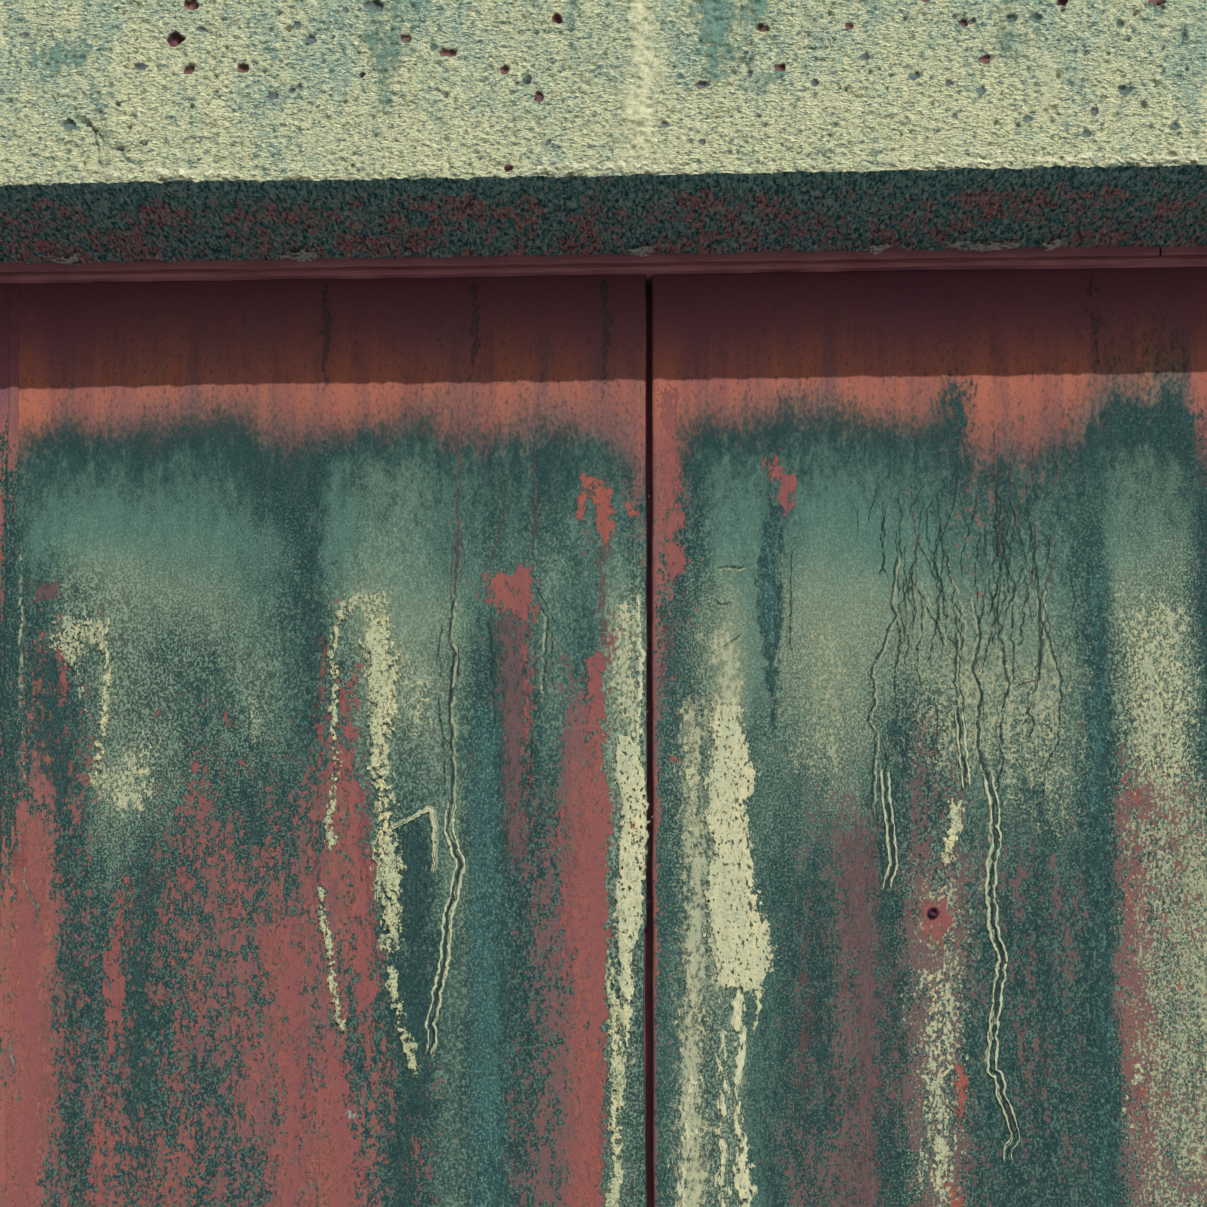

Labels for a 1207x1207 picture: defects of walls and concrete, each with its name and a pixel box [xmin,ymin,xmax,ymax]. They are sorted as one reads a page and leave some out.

water stain [629,0,653,145]
water stain [690,0,784,91]